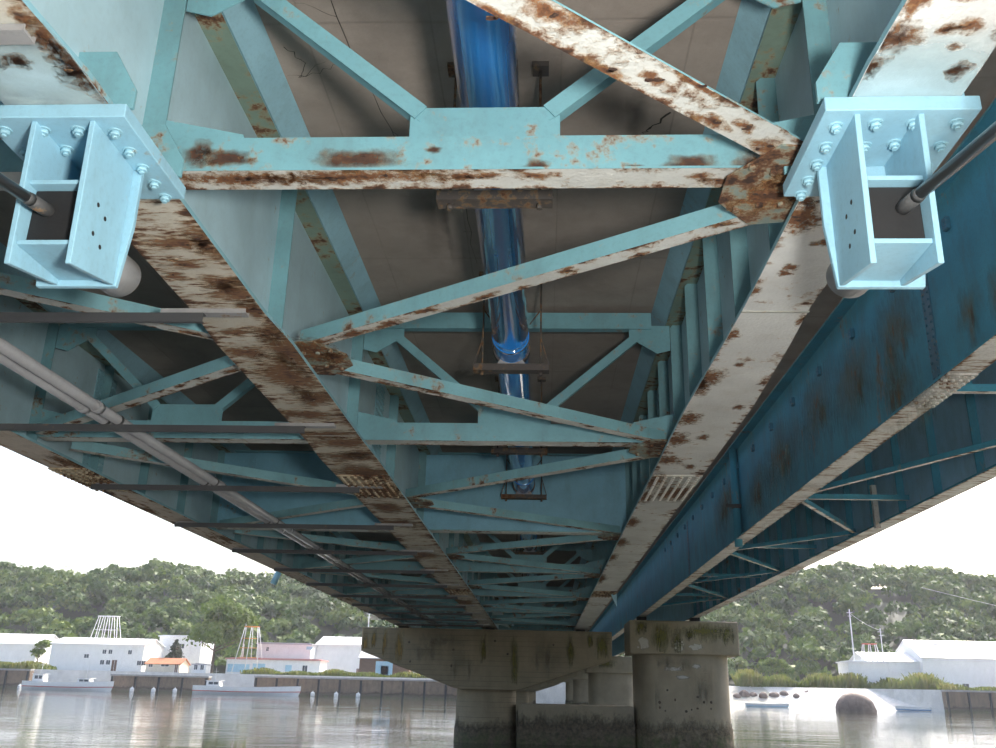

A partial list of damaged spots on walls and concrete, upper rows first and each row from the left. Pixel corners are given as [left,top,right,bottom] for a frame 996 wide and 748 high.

rust [9,5,95,91]
crack [306,1,350,48]
rust [523,0,579,27]
rust [865,0,931,77]
rust [935,18,984,50]
rust [638,71,665,86]
rust [693,112,781,165]
rust [181,143,501,187]
rust [523,161,561,181]
rust [713,174,822,234]
rust [141,222,403,419]
water stain [363,632,402,658]